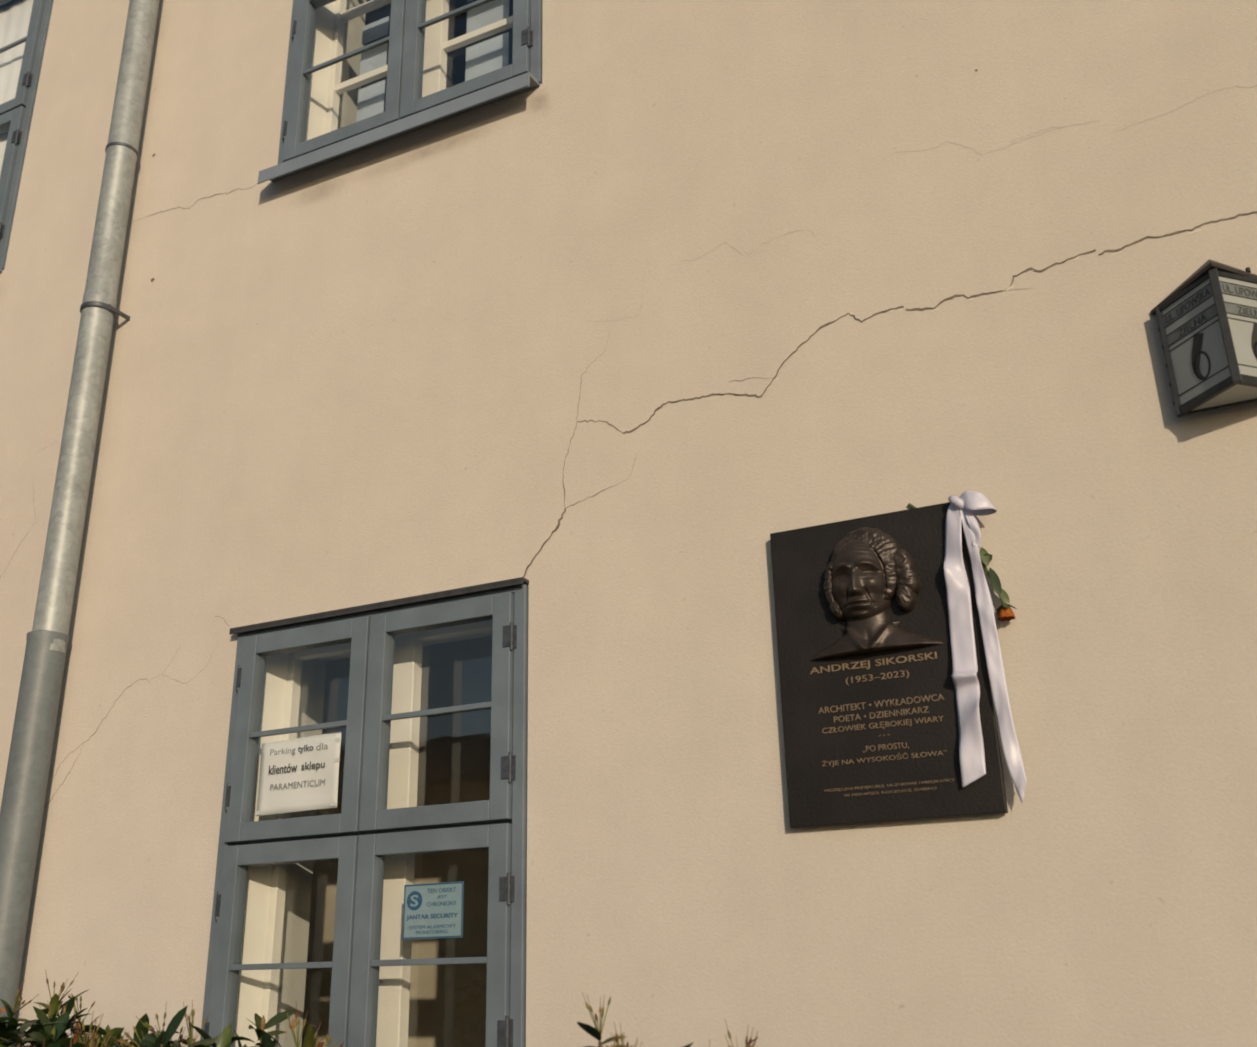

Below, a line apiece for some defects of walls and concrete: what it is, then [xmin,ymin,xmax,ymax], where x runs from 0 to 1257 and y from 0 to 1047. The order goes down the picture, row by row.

crack [523,211,1257,577]